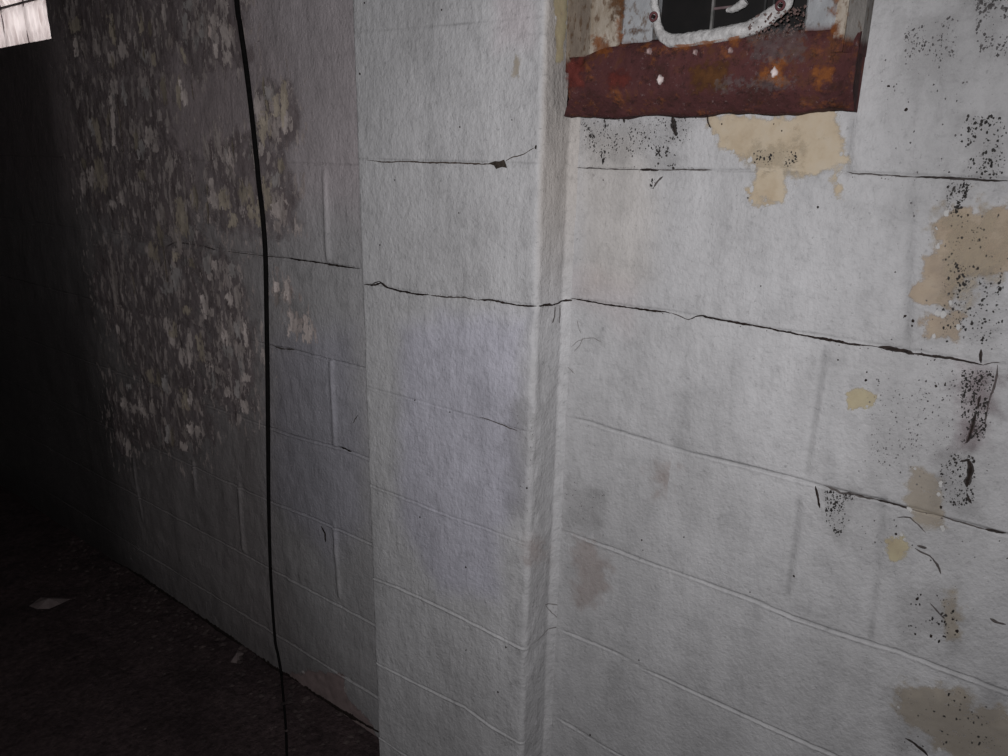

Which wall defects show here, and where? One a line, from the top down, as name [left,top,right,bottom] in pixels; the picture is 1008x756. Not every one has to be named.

corrosion [609,0,642,41]
corrosion [567,57,584,87]
corrosion [759,60,789,87]
crack [368,148,533,169]
mould [581,117,711,189]
peeling [707,110,849,208]
crack [849,172,1007,182]
peeling [904,206,1008,341]
crack [166,241,1000,424]
peeling [846,371,880,410]
mould [863,329,995,506]
crack [815,485,1006,574]